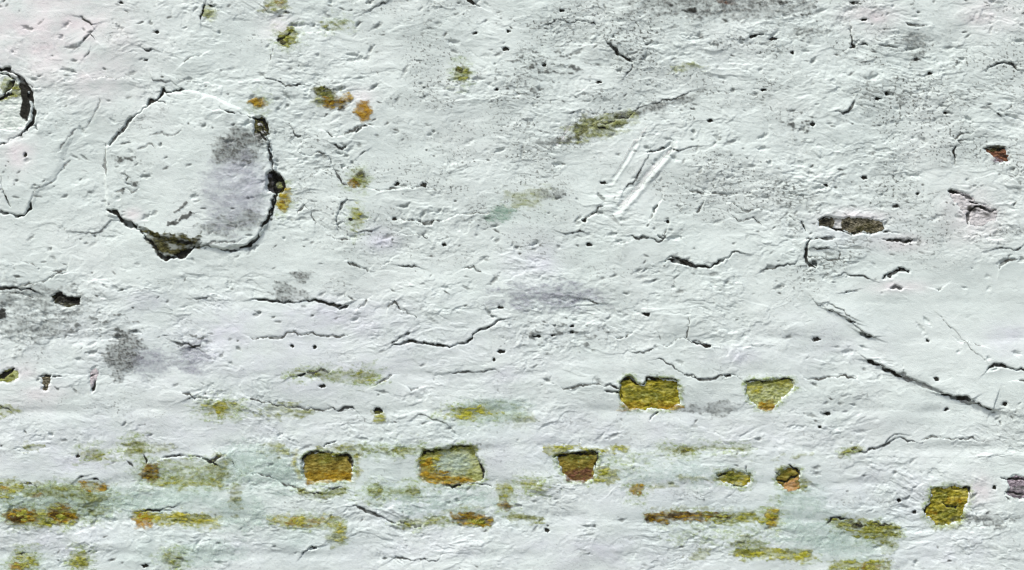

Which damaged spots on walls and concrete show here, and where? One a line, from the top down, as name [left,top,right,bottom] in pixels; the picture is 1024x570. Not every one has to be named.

crack [624,205,740,268]
spalling [818,217,913,243]
crack [251,299,502,374]
spalling [605,374,685,414]
spalling [742,377,799,411]
spalling [293,443,360,485]
spalling [416,441,488,489]
spalling [543,445,627,487]
spalling [715,470,754,491]
spalling [775,456,810,494]
spalling [912,485,971,528]